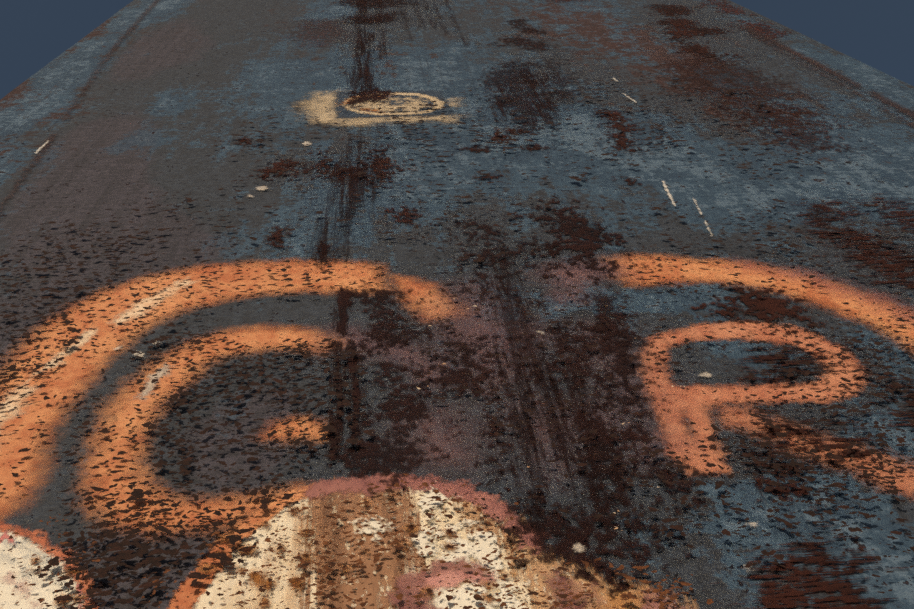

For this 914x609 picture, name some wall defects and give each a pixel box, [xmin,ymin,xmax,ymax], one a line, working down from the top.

rust [640,0,860,87]
rust [249,144,416,188]
rust [343,87,403,113]
peeling [213,71,822,263]
rust [713,100,871,162]
rust [786,193,914,298]
peeling [0,160,914,609]
rust [736,536,909,609]